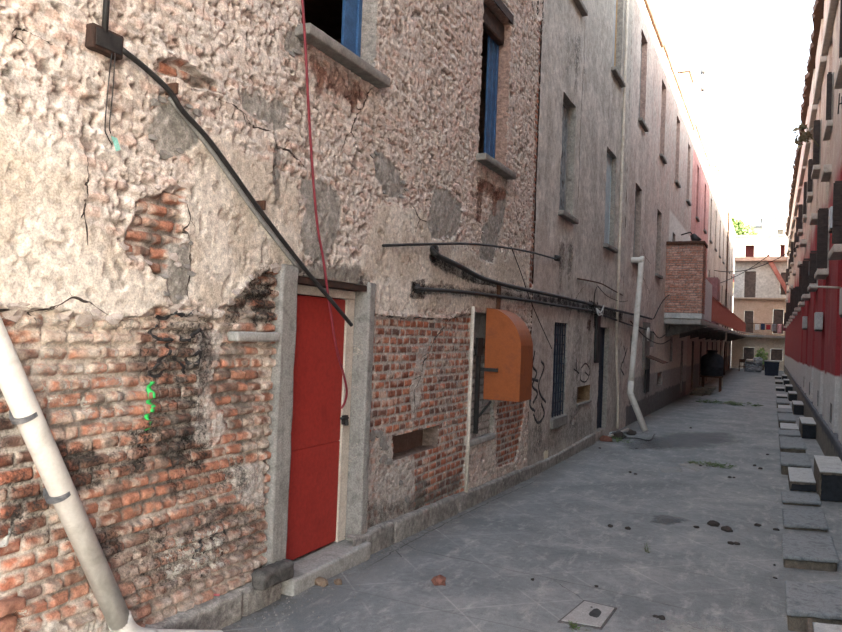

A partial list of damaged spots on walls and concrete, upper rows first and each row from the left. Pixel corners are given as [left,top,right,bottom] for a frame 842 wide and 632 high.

crack [81,150,89,245]
crack [0,294,108,321]
peeling [0,185,294,632]
peeling [366,310,471,529]
peeling [495,400,526,467]
leakage [168,438,256,498]
leakage [165,526,223,580]